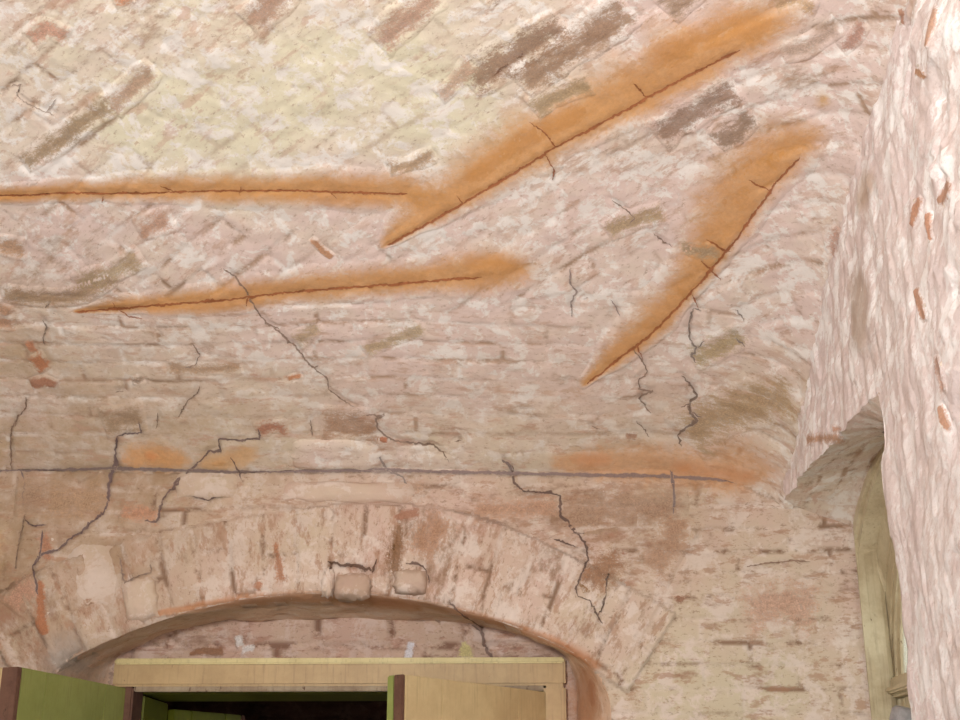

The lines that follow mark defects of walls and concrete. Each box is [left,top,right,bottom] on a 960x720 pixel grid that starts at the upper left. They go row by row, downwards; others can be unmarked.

crack [0,268,734,623]
corrosion [0,0,819,319]
corrosion [545,430,791,507]
crack [587,157,800,446]
corrosion [576,84,838,390]